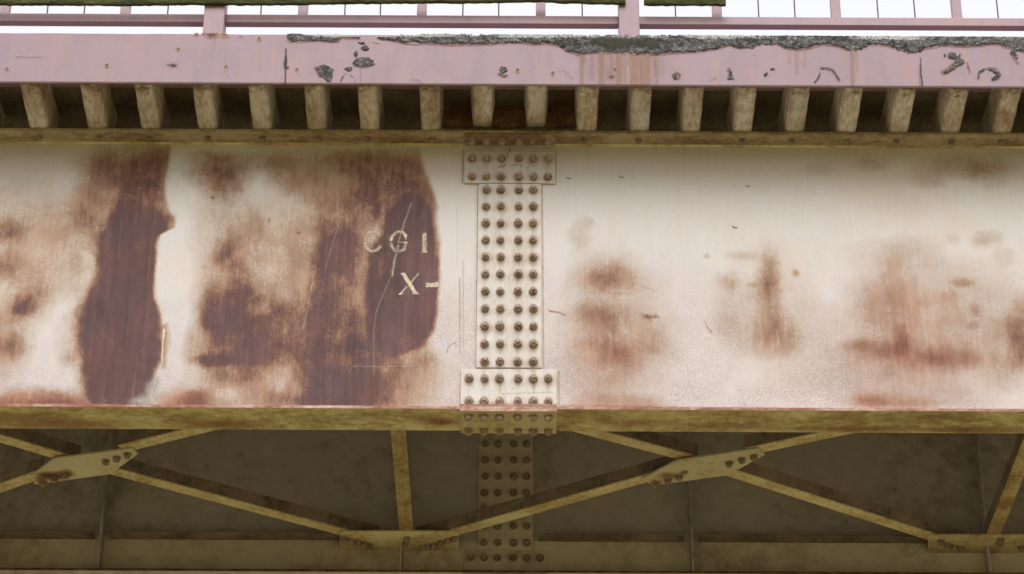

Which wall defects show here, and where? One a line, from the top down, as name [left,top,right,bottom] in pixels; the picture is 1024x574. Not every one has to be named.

spalling [287,33,1024,82]
rust [0,145,457,428]
rust [560,261,677,425]